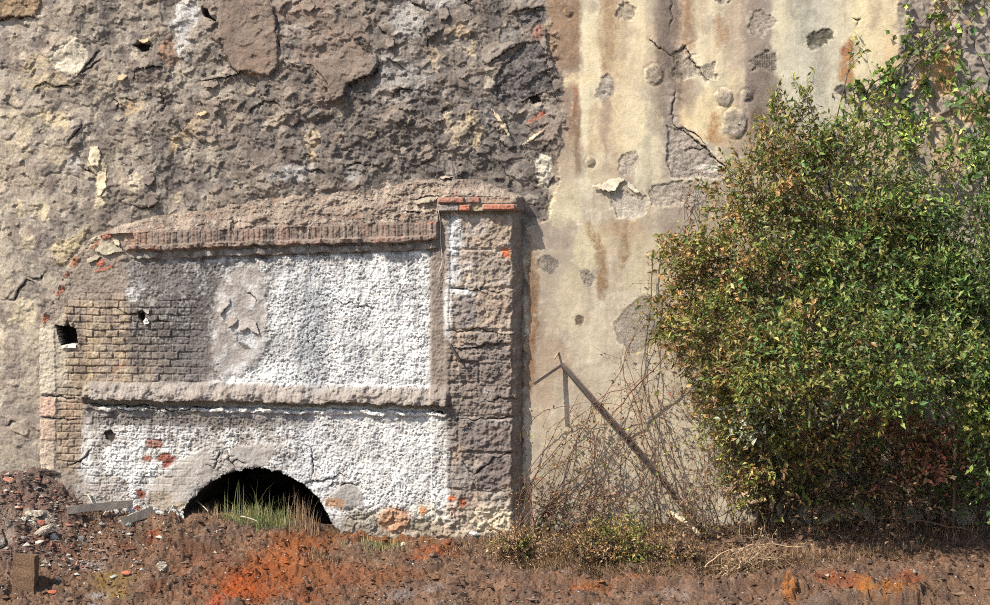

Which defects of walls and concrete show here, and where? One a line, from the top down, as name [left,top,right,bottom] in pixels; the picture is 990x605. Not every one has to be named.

spalling [0,0,41,19]
flaking render [807,29,833,50]
spalling [595,74,615,100]
spalling [522,111,547,145]
crack [671,89,732,177]
peeling [87,146,108,210]
spalling [592,126,727,219]
spalling [56,233,120,296]
damp [592,238,607,291]
spalling [217,299,259,349]
spalling [613,295,663,353]
spalling [142,439,175,467]